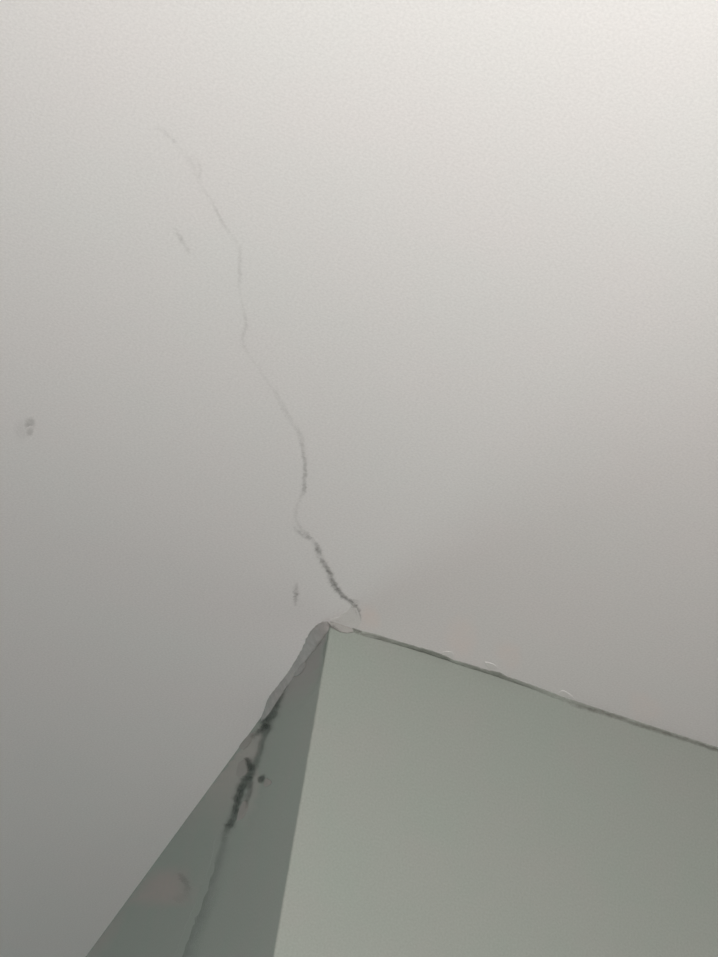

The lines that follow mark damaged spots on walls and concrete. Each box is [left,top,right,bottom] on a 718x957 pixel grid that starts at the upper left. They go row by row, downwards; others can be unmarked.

crack [262,697,280,729]
crack [174,759,253,957]